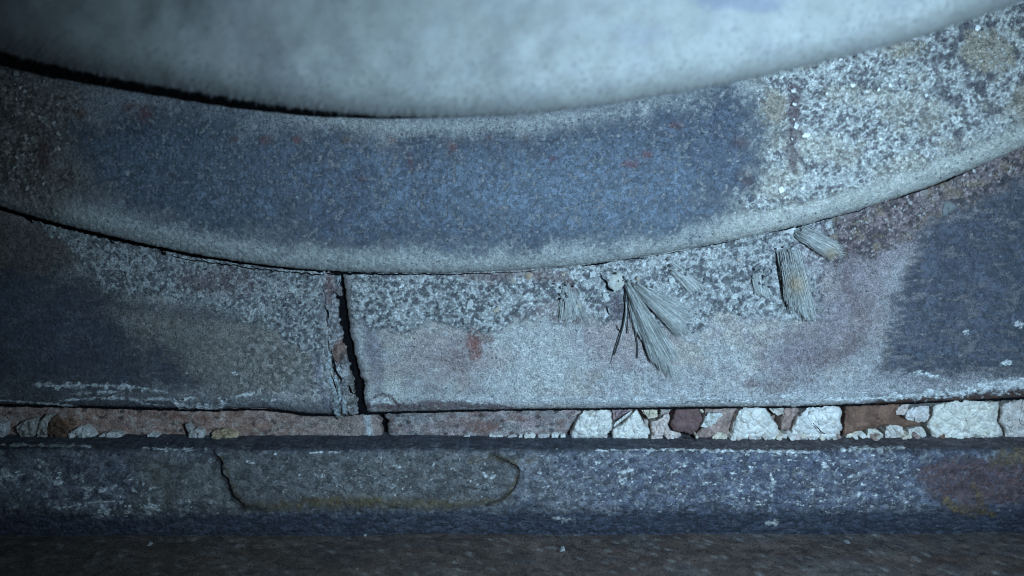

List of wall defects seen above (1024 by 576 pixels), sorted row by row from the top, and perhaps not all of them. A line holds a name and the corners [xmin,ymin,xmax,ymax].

crack [0,167,1024,434]
crack [214,451,246,508]